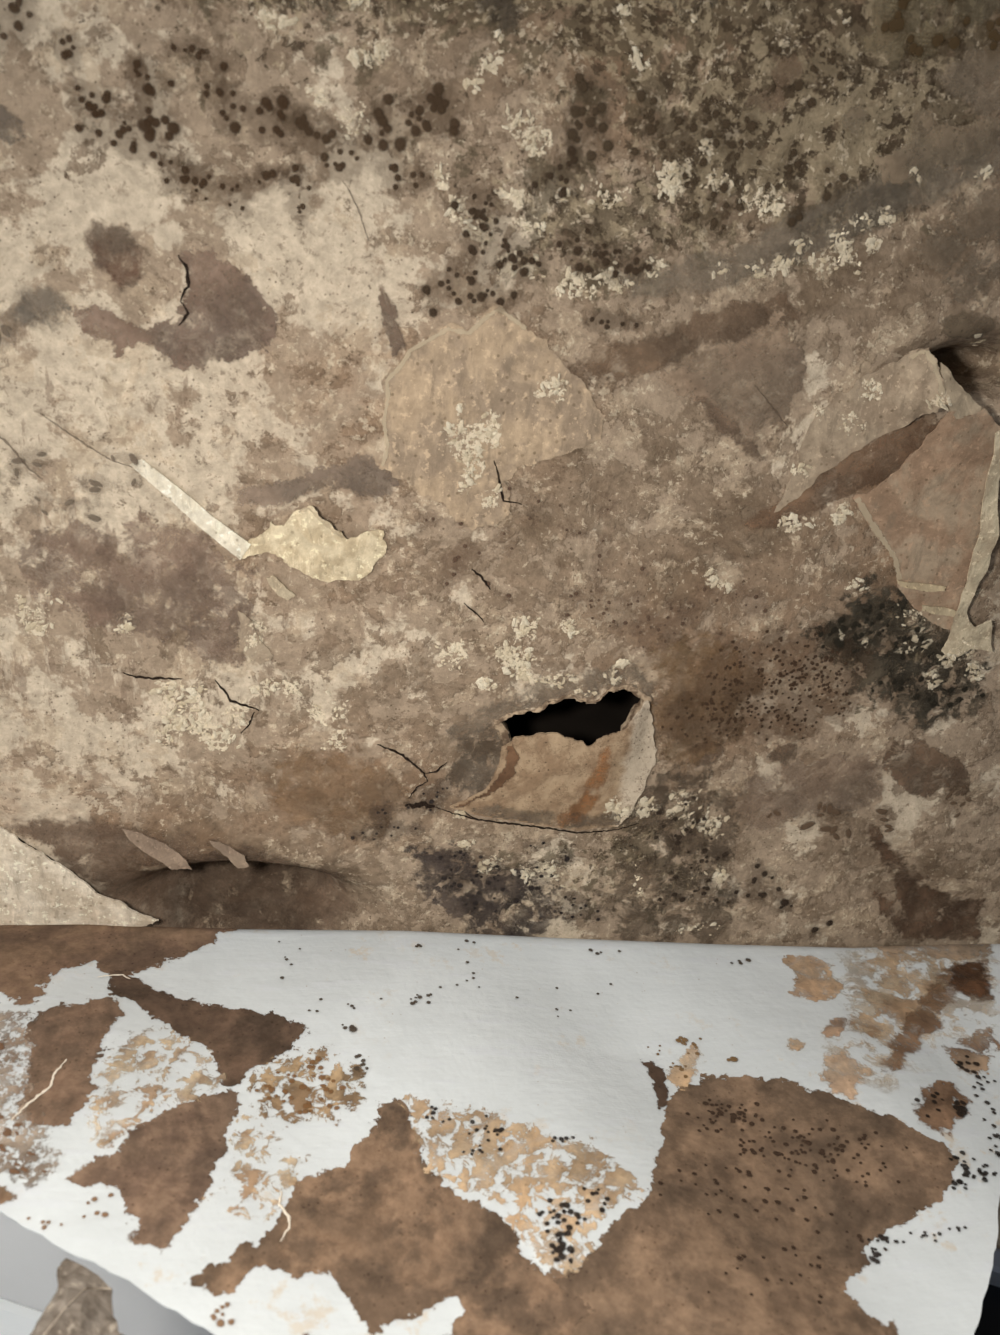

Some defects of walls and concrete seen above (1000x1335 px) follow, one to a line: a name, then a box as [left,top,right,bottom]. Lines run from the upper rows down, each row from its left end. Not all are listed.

leakage [75,59,245,211]
leakage [203,74,1000,403]
peeling [130,459,387,583]
peeling [379,304,605,530]
peeling [774,347,1000,661]
crack [123,672,182,680]
crack [215,680,259,733]
crack [377,744,639,834]
leakage [148,574,993,1005]
spalling [505,689,640,746]
leakage [0,819,355,1255]
leakage [186,1017,1000,1335]